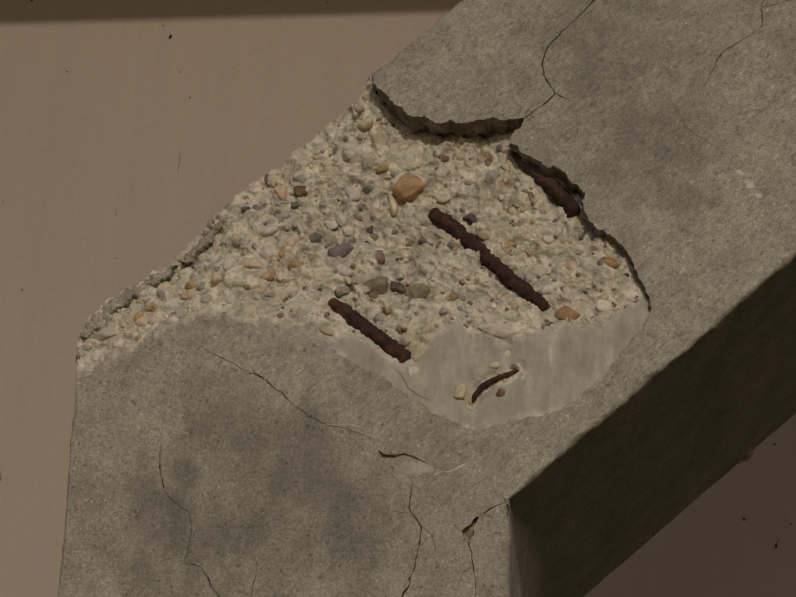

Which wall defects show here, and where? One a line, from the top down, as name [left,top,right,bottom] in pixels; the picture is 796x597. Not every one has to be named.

crack [523,0,595,120]
crack [698,0,789,94]
spalling [75,77,652,430]
crack [195,343,375,442]
crack [158,446,219,597]
crack [389,476,436,597]
crack [468,543,476,596]
crack [477,492,522,520]